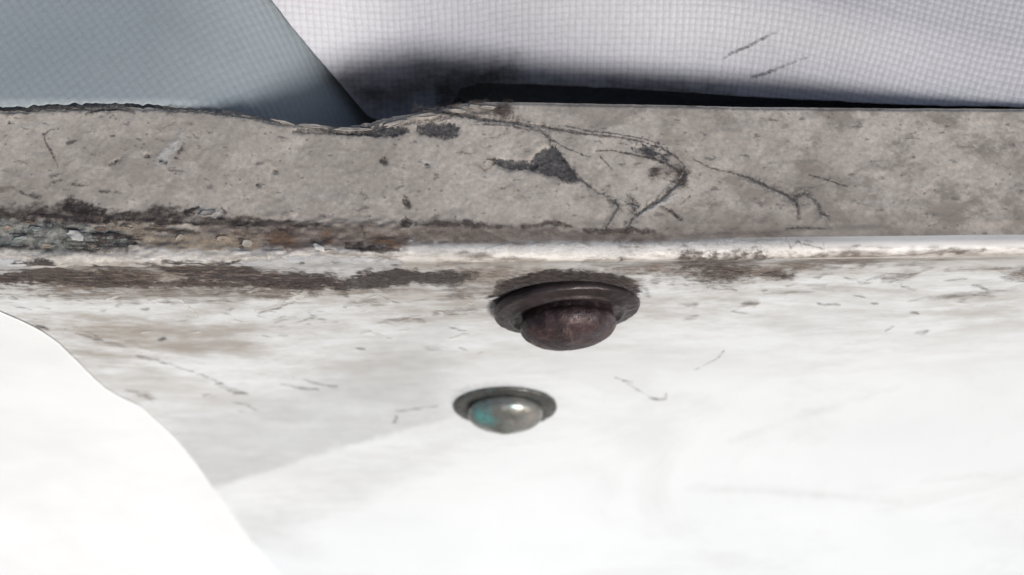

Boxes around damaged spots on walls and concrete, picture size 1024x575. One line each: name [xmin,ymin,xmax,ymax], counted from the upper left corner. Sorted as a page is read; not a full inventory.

spalling [270,102,511,139]
spalling [484,148,578,184]
crack [416,107,845,229]
leakage [0,187,247,228]
leakage [0,258,541,303]